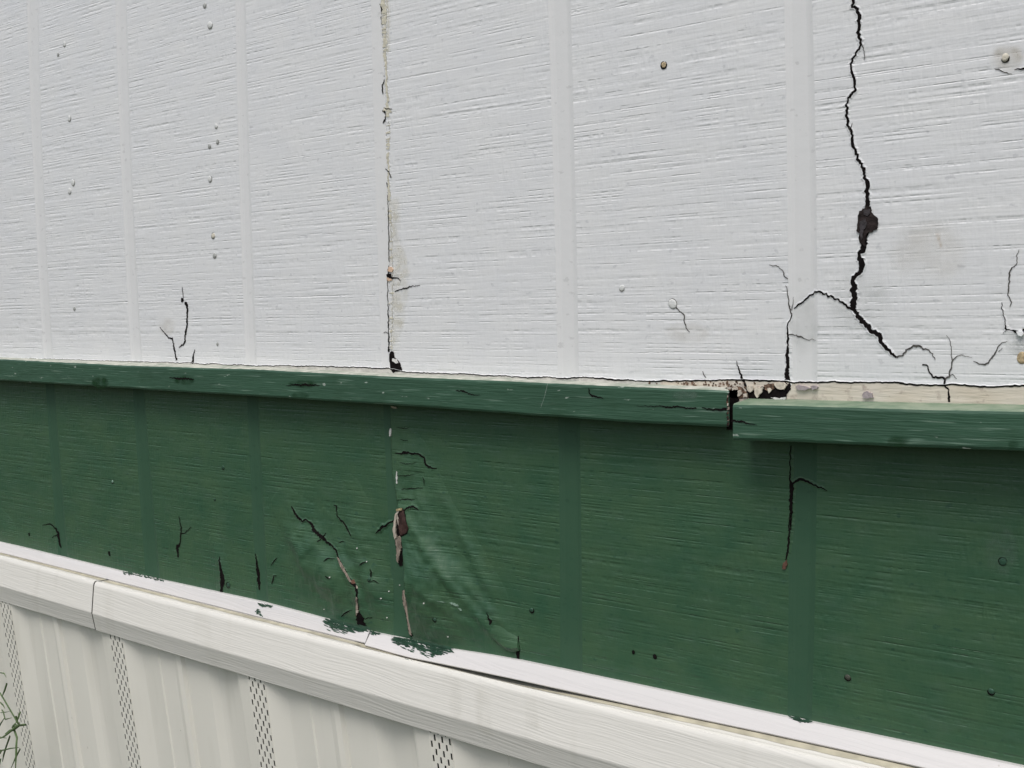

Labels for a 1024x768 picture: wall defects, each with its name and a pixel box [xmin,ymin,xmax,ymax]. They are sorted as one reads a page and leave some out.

peeling [33,0,1024,426]
crack [771,0,1024,402]
crack [383,169,420,352]
crack [161,290,195,380]
crack [28,523,61,548]
crack [176,518,191,557]
crack [217,556,226,592]
crack [254,554,262,590]
crack [291,504,367,626]
spalling [395,508,407,566]
crack [395,450,437,471]
crack [784,446,827,560]